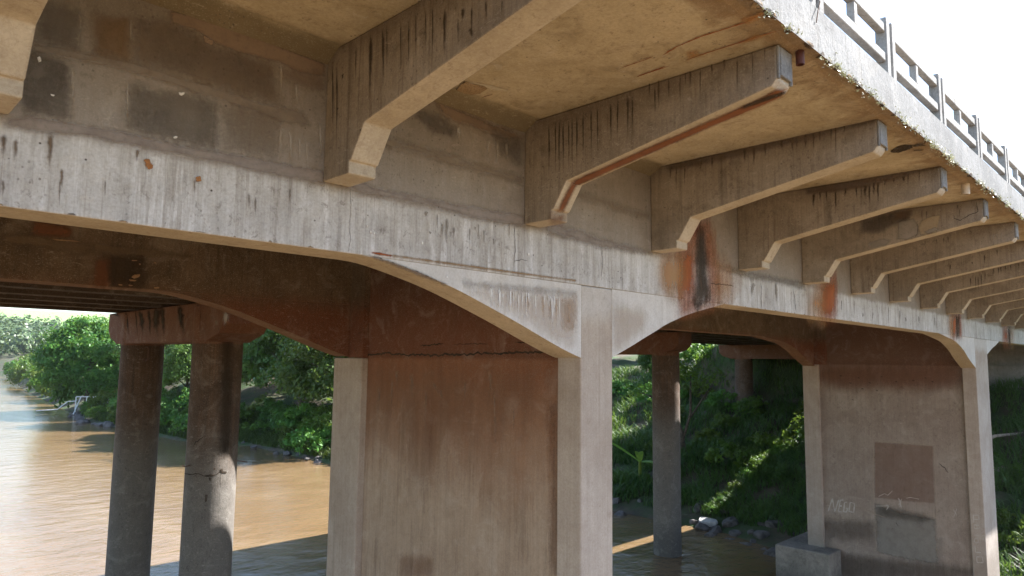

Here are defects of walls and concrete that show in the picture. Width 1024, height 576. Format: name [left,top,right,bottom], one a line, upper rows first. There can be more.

corrosion [553,89,785,221]
corrosion [662,226,728,313]
corrosion [813,276,837,318]
crack [368,342,544,357]
crack [184,468,227,502]